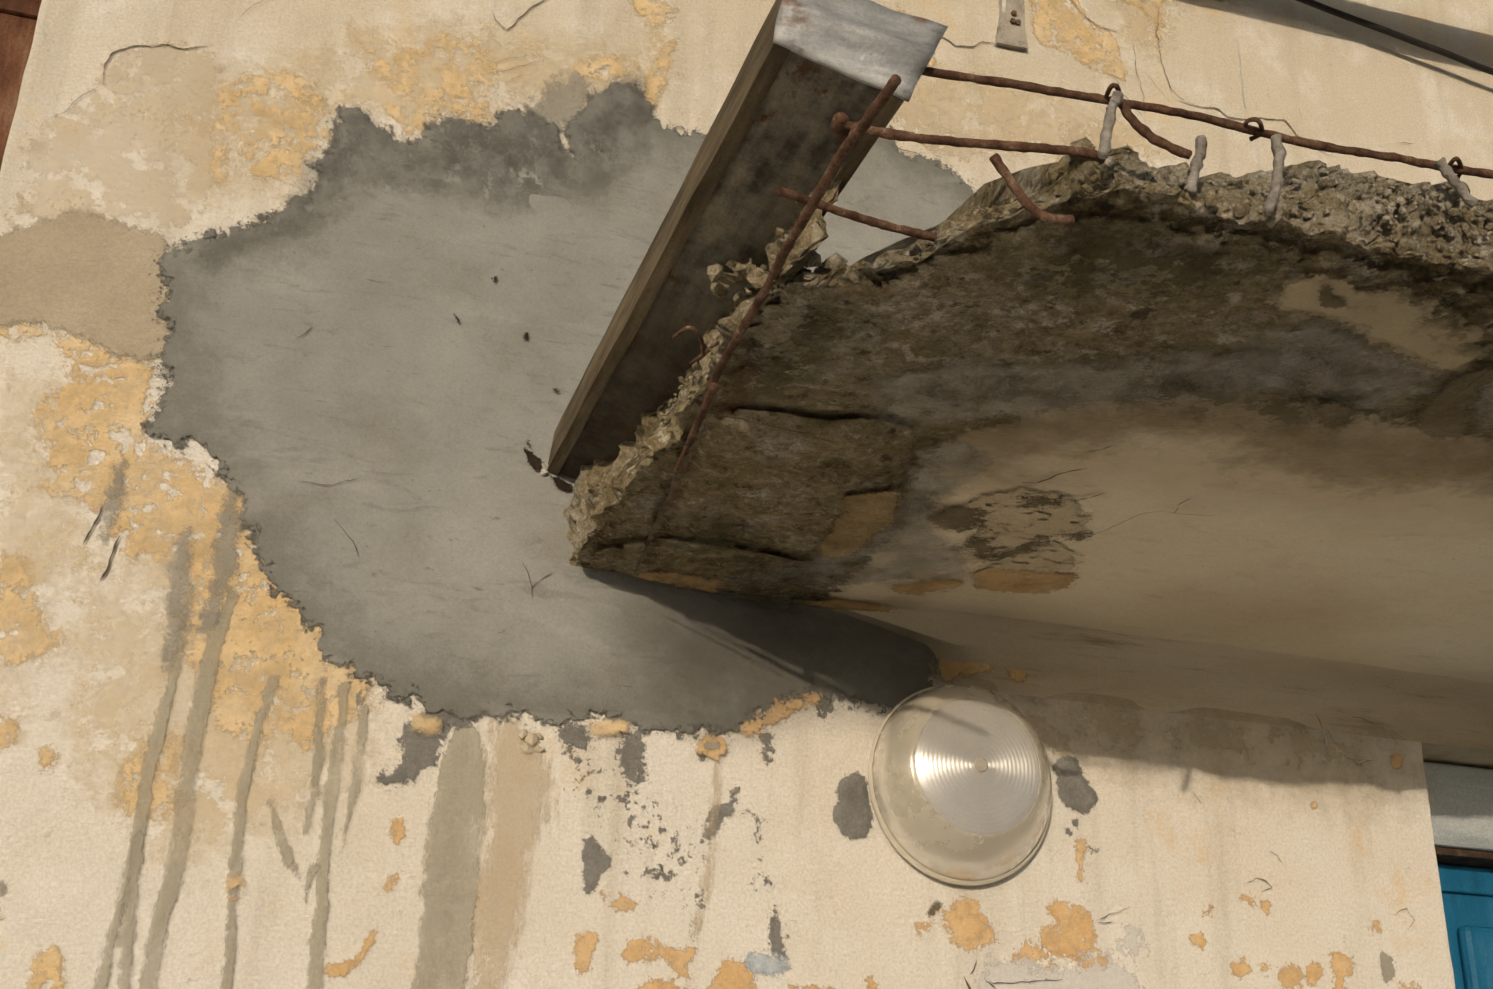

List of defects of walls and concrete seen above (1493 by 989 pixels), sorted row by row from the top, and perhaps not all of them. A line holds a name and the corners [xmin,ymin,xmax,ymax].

crack [491,0,543,30]
spalling [587,56,1493,613]
peeling [0,208,376,753]
water stain [95,493,245,989]
water stain [221,675,280,989]
water stain [269,679,369,989]
water stain [411,718,549,989]
peeling [600,825,757,989]
water stain [676,577,921,681]
peeling [914,896,1150,989]
peeling [1229,951,1355,989]
peeling [1380,952,1421,989]